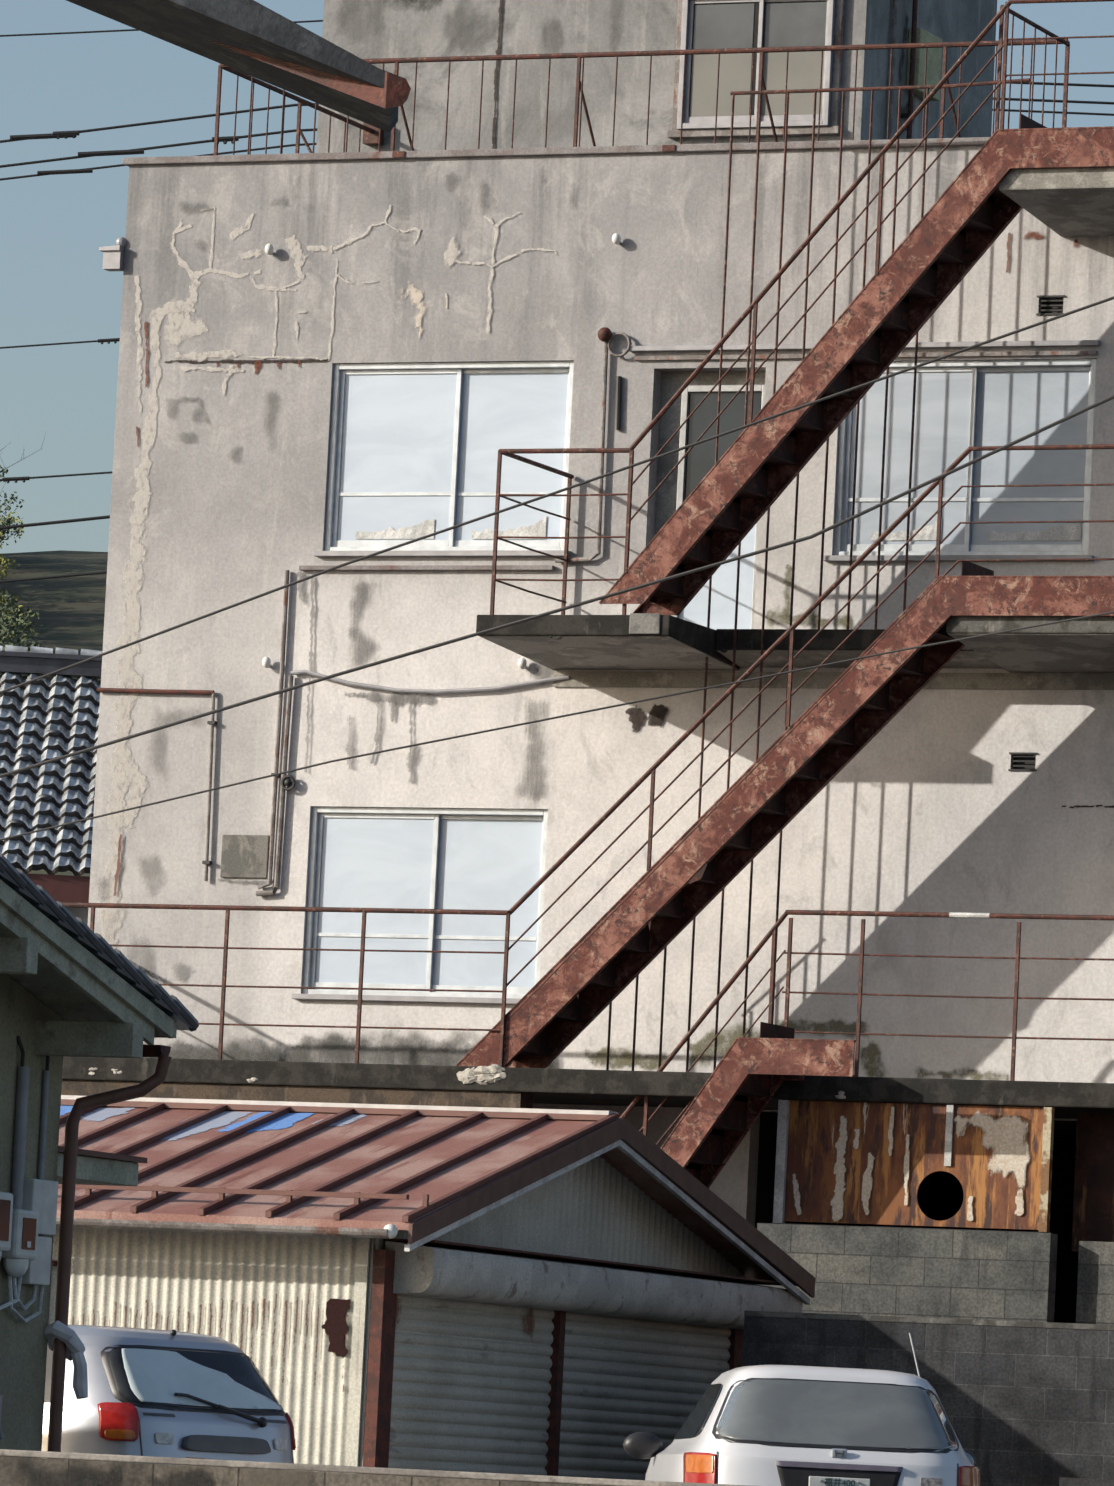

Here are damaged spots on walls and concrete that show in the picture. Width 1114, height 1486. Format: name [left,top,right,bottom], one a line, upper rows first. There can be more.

crack [150,205,557,395]
leakage [349,583,373,664]
leakage [297,571,315,772]
leakage [345,691,434,783]
leakage [778,1019,865,1037]
leakage [142,1034,474,1066]
leakage [918,1069,1008,1081]
leakage [30,1467,120,1486]
leakage [151,1472,213,1486]